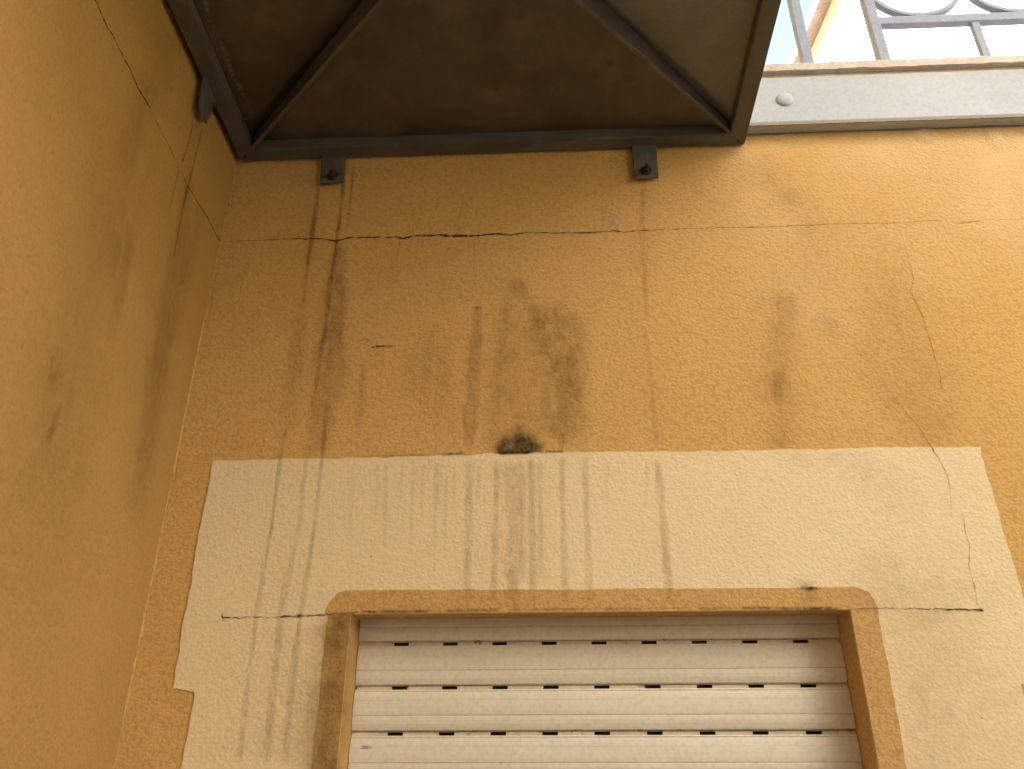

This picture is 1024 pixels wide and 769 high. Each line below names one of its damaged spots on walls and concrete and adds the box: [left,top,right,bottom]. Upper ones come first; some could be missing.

crack [254,223,865,242]
crack [879,605,984,613]
crack [221,611,357,619]